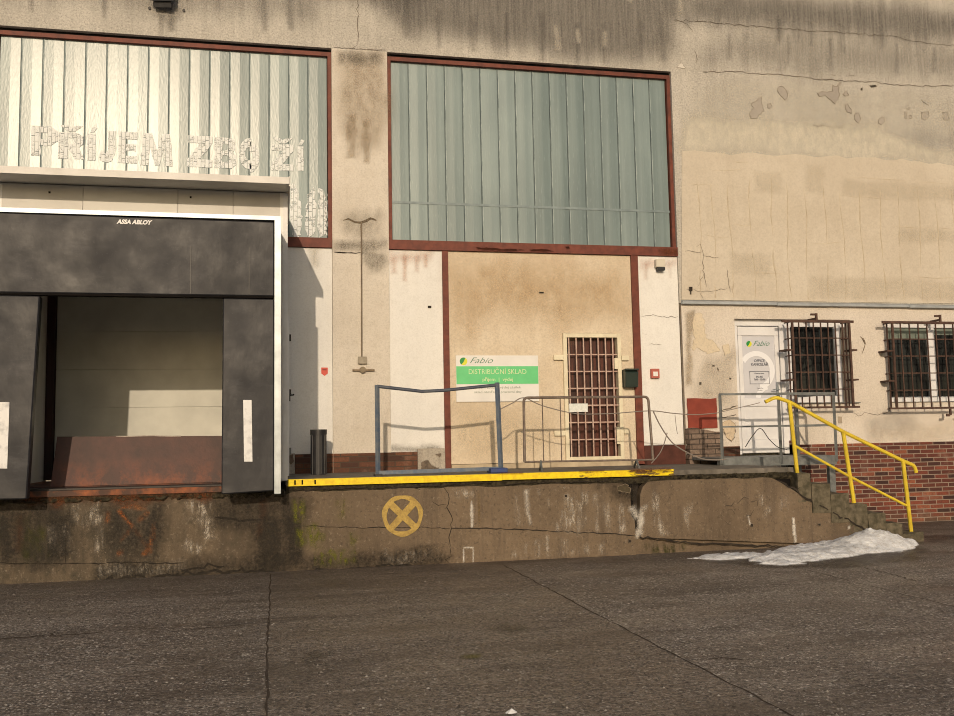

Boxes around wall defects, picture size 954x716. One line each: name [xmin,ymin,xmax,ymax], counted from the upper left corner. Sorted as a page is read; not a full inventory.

water stain [387,0,682,54]
crack [677,19,950,46]
water stain [696,0,954,36]
crack [695,52,954,105]
peeling [817,82,861,123]
peeling [687,312,730,385]
spalling [723,419,736,441]
water stain [90,495,443,580]
crack [287,480,786,563]
crack [778,480,865,530]